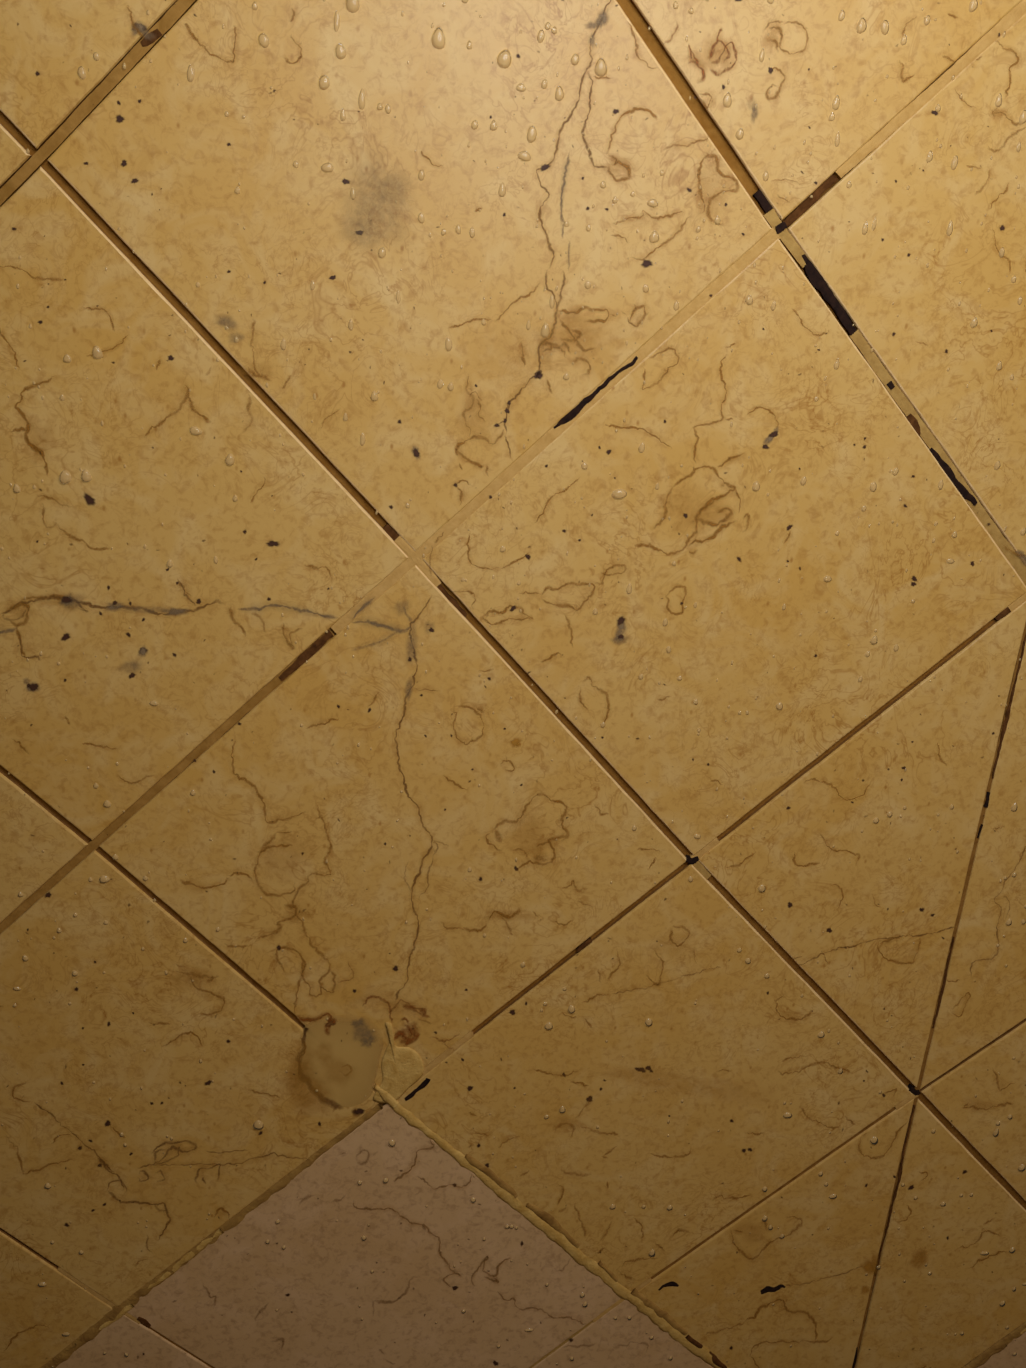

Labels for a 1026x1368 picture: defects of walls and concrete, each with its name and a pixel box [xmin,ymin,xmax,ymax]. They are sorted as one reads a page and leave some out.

crack [0,591,433,999]